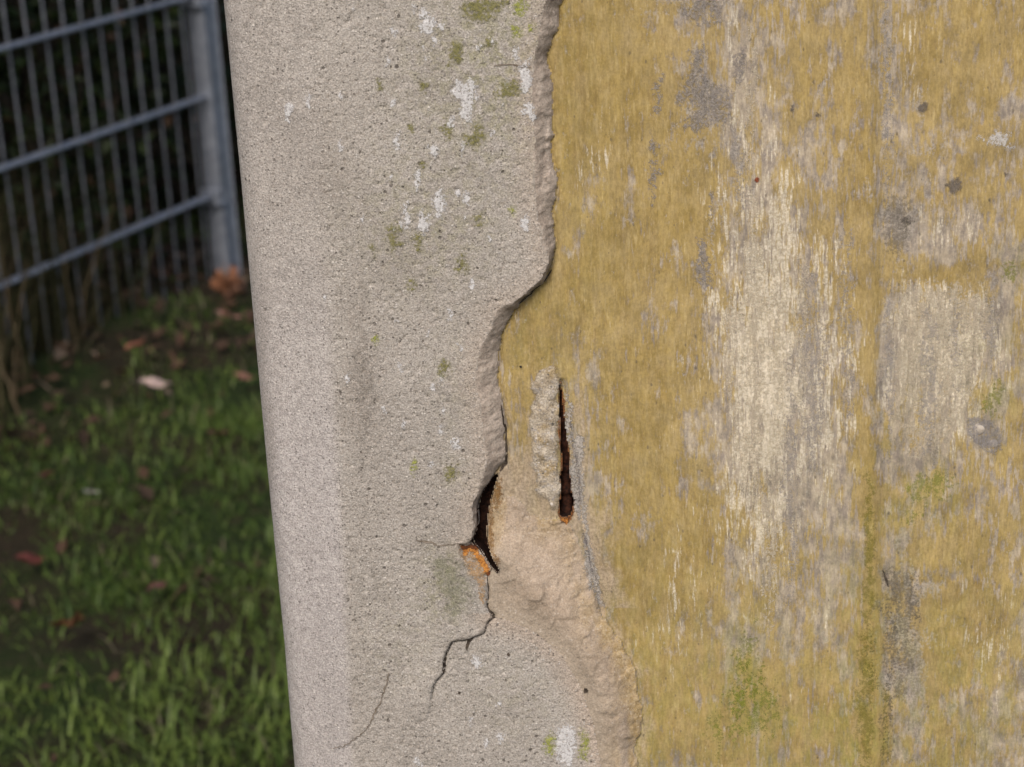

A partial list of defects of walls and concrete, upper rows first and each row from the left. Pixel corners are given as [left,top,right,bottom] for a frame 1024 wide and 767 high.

rust [557,381,575,525]
spalling [469,0,1024,767]
rust [459,478,502,604]
crack [431,568,496,698]